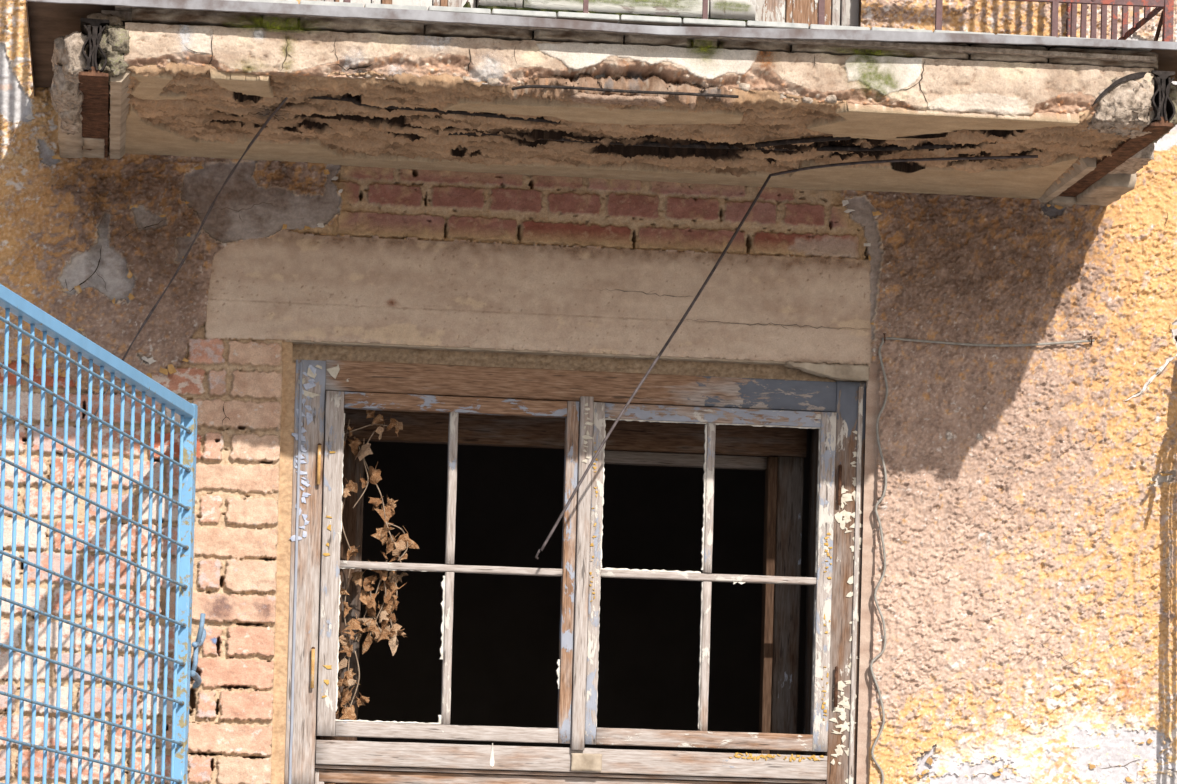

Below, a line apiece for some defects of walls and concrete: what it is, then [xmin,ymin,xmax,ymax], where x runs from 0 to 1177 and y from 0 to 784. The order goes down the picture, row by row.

peeling [0,42,35,123]
peeling [1154,125,1177,151]
spalling [124,42,1145,340]
peeling [57,212,136,304]
peeling [824,431,863,579]
peeling [912,744,1034,784]
peeling [1071,723,1177,784]